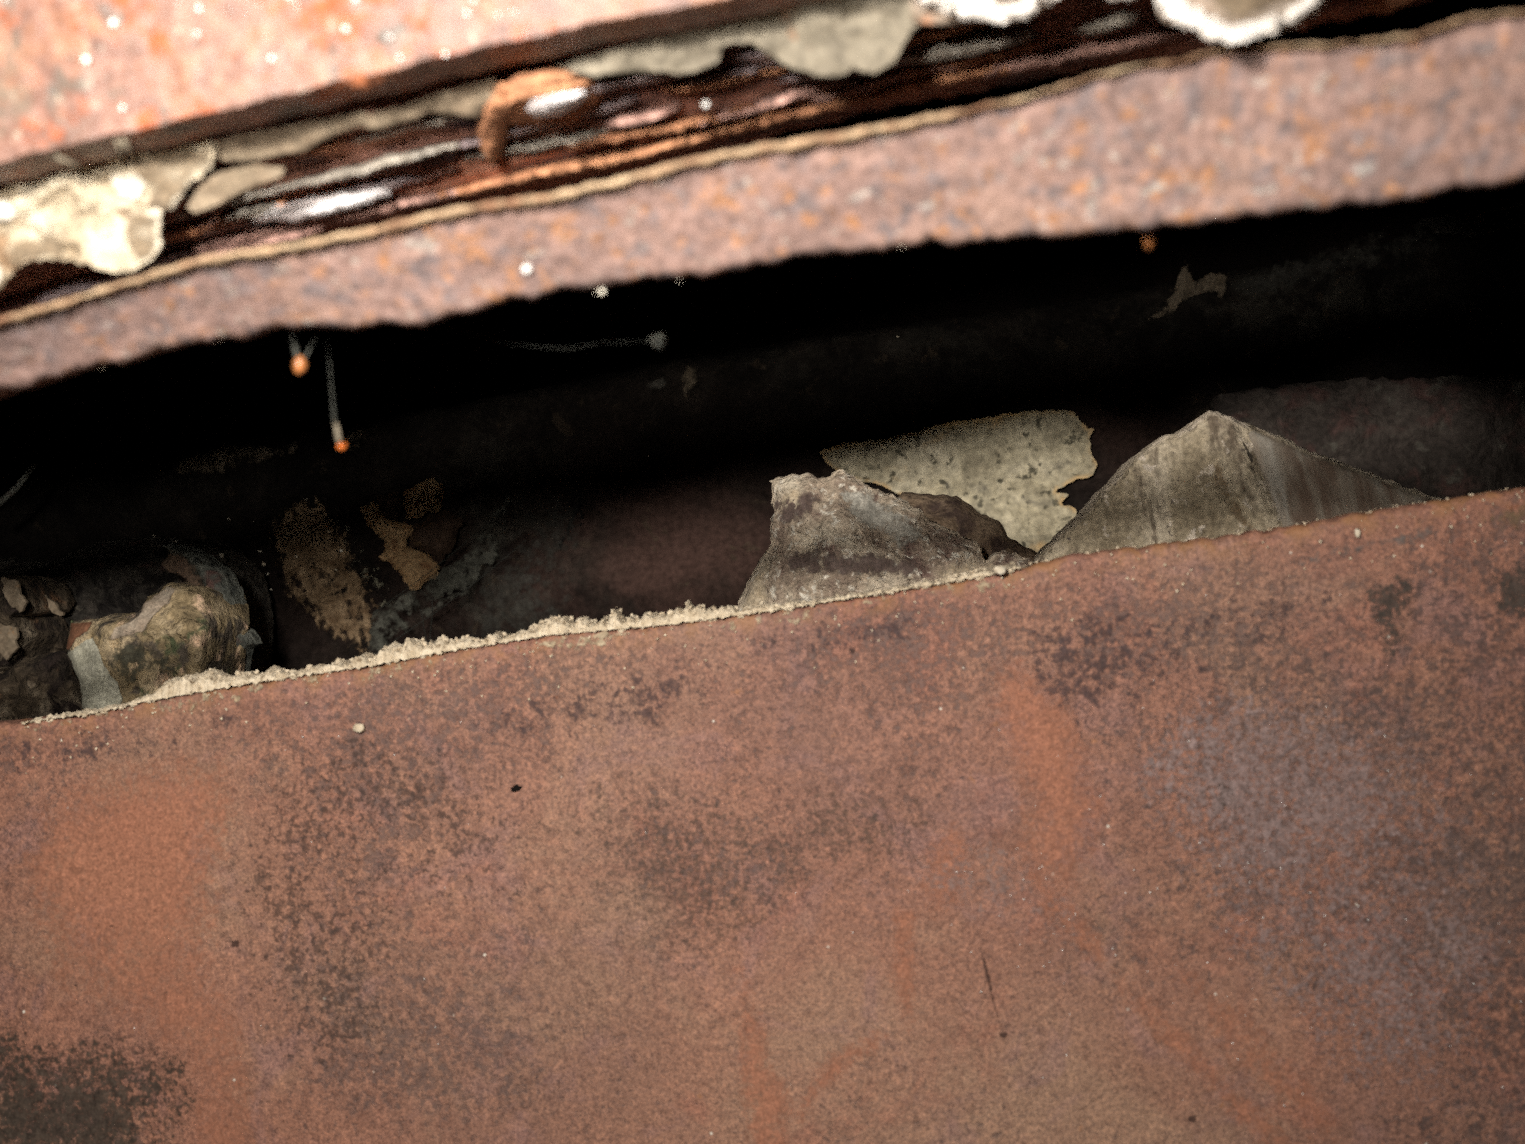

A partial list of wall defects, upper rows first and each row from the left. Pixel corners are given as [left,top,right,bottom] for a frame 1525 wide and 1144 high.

peeling [557,0,1055,78]
peeling [1155,0,1326,45]
rust [1283,0,1427,31]
peeling [0,79,510,288]
rust [0,0,1223,317]
peeling [1152,266,1227,318]
rust [162,554,200,585]
leakage [0,1027,194,1144]